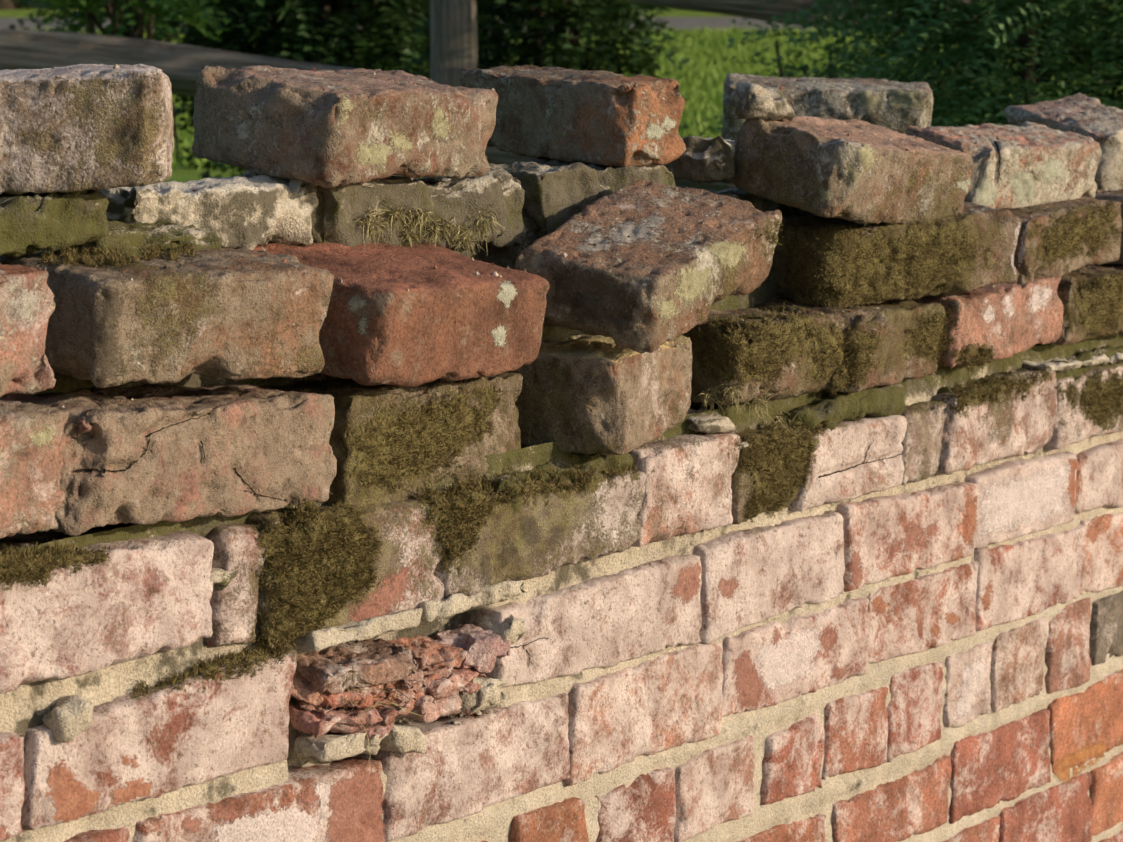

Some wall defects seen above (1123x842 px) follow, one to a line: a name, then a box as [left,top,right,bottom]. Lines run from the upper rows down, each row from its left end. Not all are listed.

crack [75,413,211,472]
crack [234,468,294,503]
spalling [289,613,526,762]